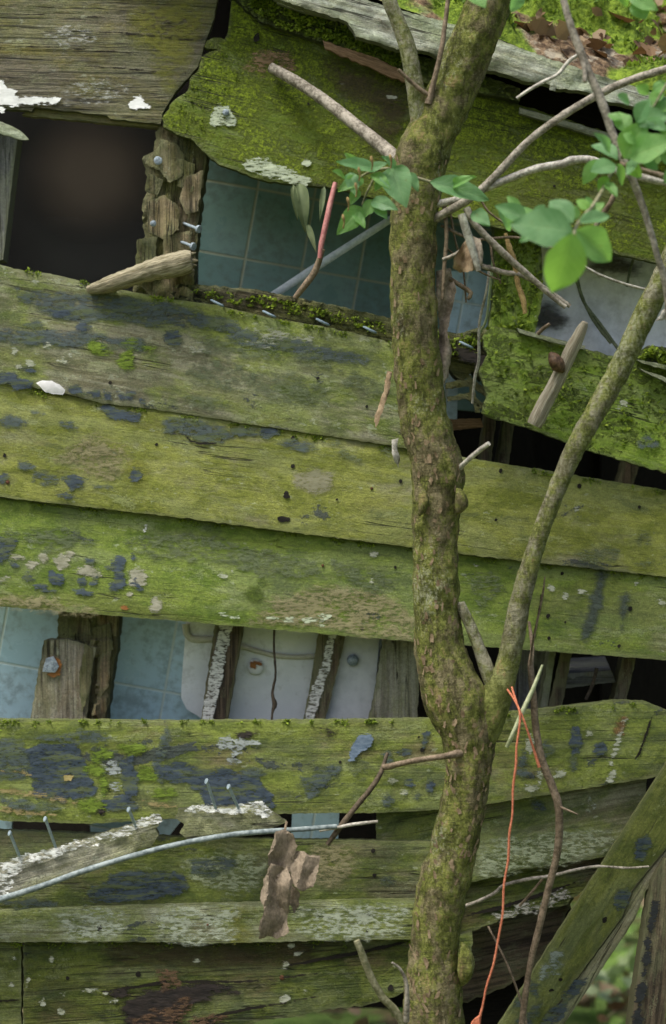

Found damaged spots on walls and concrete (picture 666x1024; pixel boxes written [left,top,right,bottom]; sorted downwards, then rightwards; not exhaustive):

peeling [0,80,150,113]